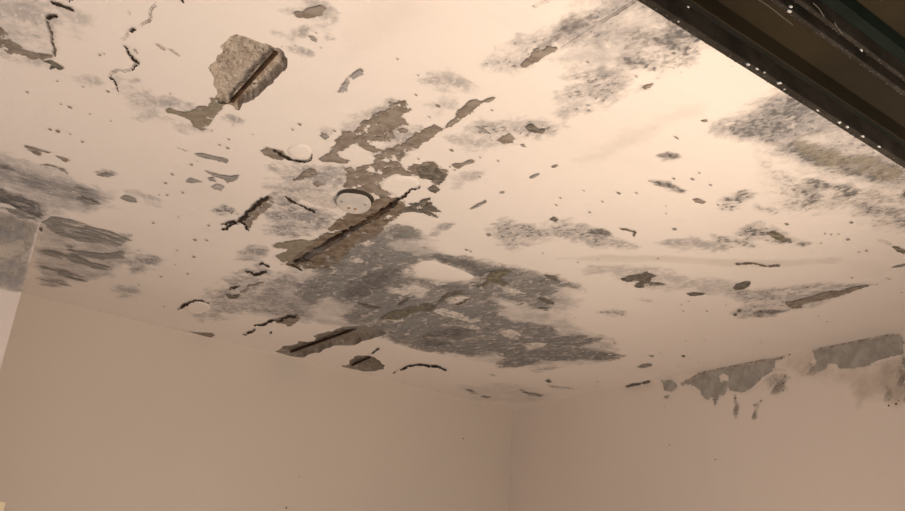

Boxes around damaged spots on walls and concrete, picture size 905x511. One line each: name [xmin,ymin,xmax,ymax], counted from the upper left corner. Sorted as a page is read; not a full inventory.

crack [46,0,74,57]
crack [110,6,180,92]
spalling [165,34,288,131]
leakage [569,75,619,112]
mould [654,26,700,56]
mould [0,187,131,287]
spalling [221,196,274,231]
peeling [261,97,495,271]
mould [719,96,905,206]
spalling [275,291,471,372]
leakage [259,221,623,367]
peeling [661,356,787,405]